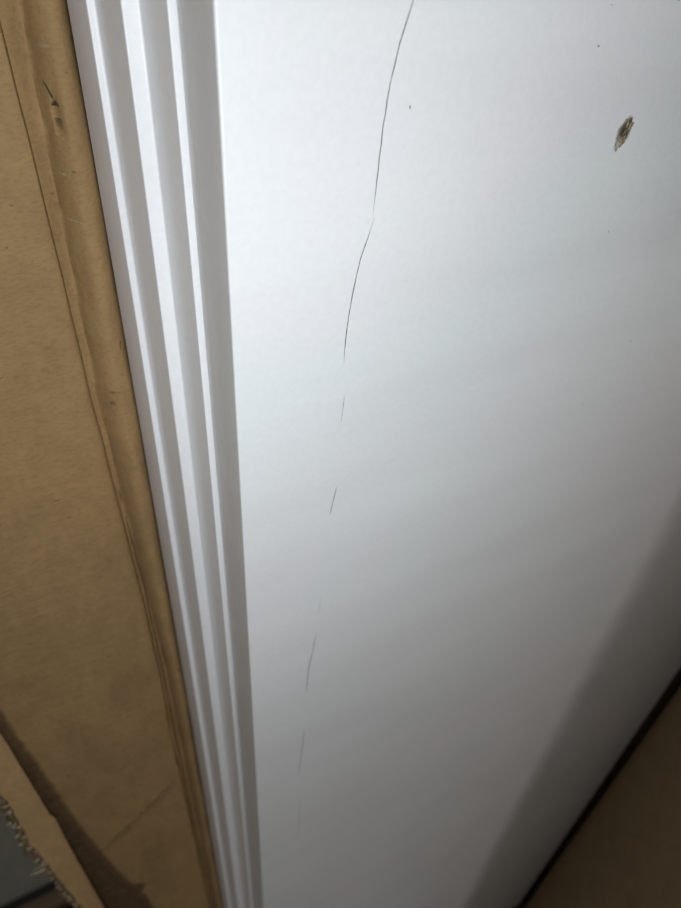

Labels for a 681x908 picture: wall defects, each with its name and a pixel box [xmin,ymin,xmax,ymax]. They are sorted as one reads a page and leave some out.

crack [344,0,414,354]